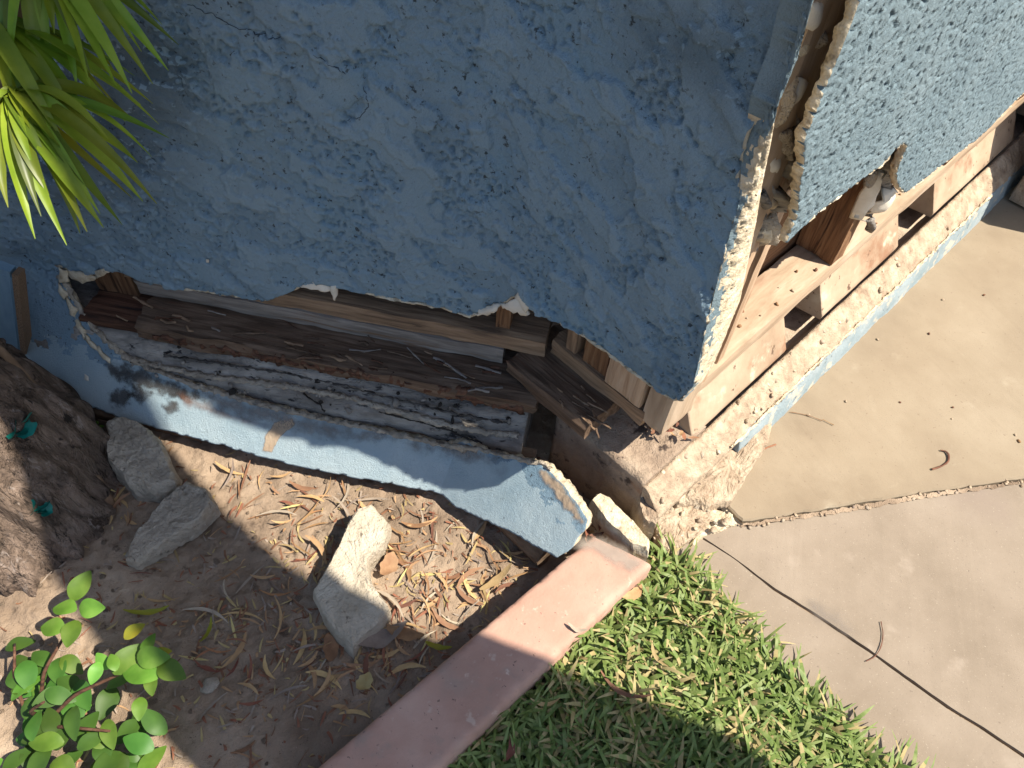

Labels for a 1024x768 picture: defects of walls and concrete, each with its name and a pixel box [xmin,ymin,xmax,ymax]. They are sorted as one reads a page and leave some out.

spalling [54,265,583,523]
spalling [576,333,653,387]
spalling [664,0,829,401]
spalling [642,133,1024,521]
crack [721,481,1019,527]